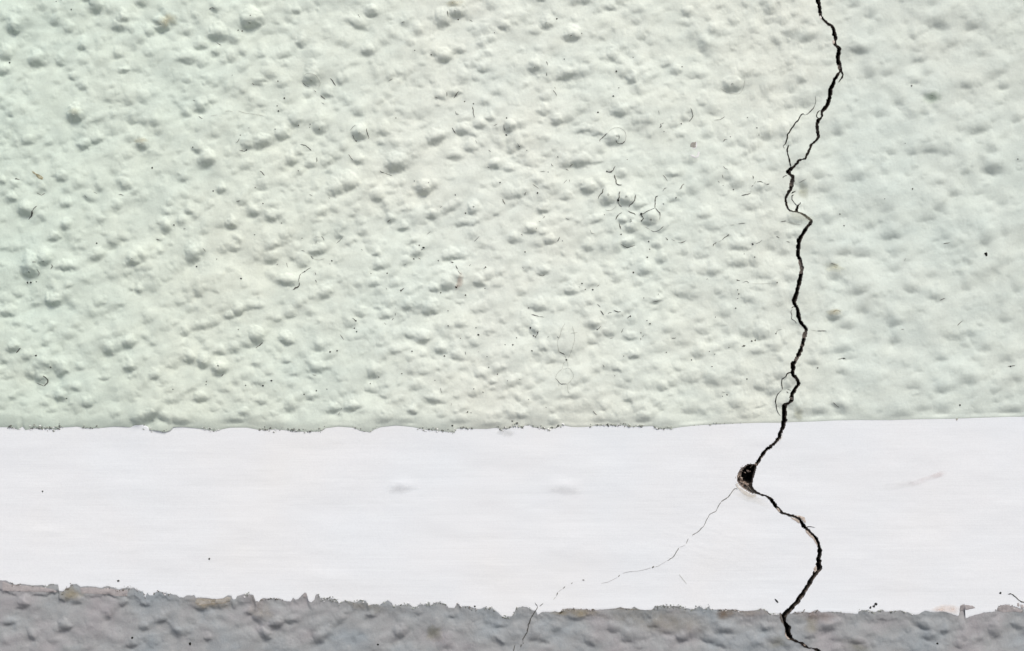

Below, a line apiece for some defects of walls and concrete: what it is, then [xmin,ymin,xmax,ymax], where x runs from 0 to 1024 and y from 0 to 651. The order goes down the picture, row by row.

crack [513,0,844,651]